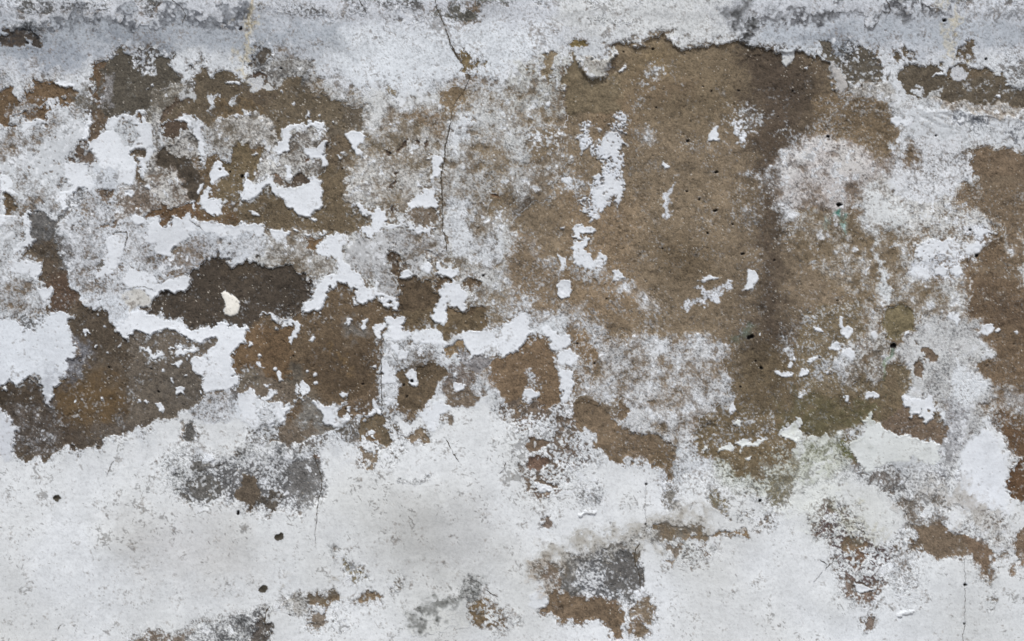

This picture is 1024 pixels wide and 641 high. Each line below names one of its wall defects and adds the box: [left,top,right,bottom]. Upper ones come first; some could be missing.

crack [435,0,470,251]
spalling [0,30,1024,513]
peeling [533,548,657,640]
spalling [813,492,1024,613]